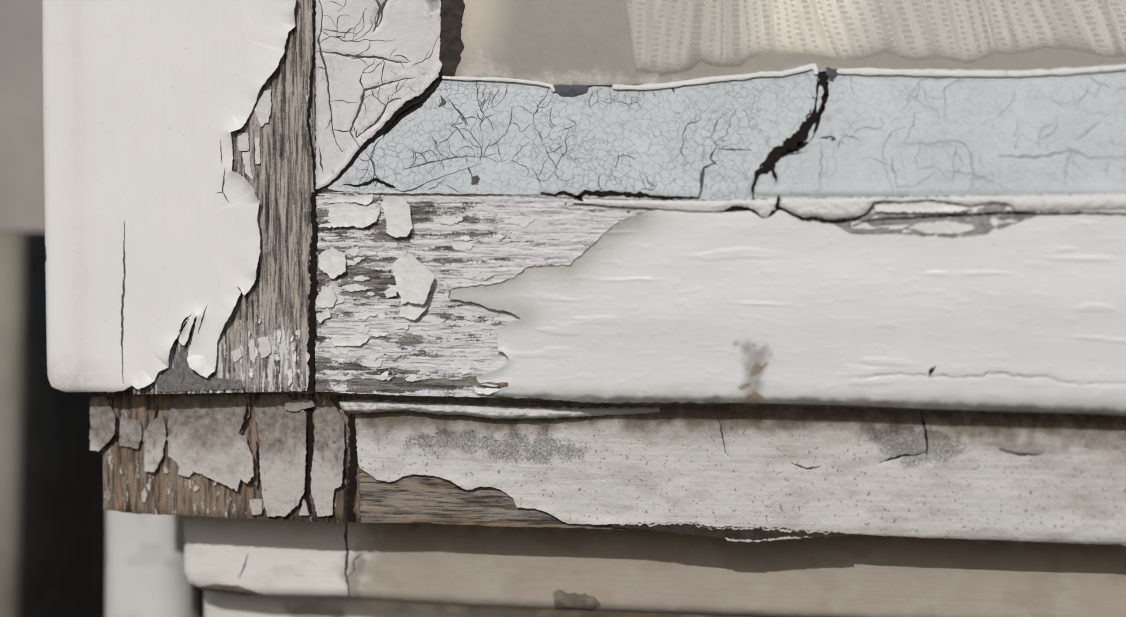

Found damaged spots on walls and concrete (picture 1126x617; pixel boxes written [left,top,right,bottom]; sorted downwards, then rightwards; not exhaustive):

crack [119,222,127,384]
peeling [89,0,705,530]
crack [304,0,1126,513]
crack [239,401,260,489]
crack [344,417,362,596]